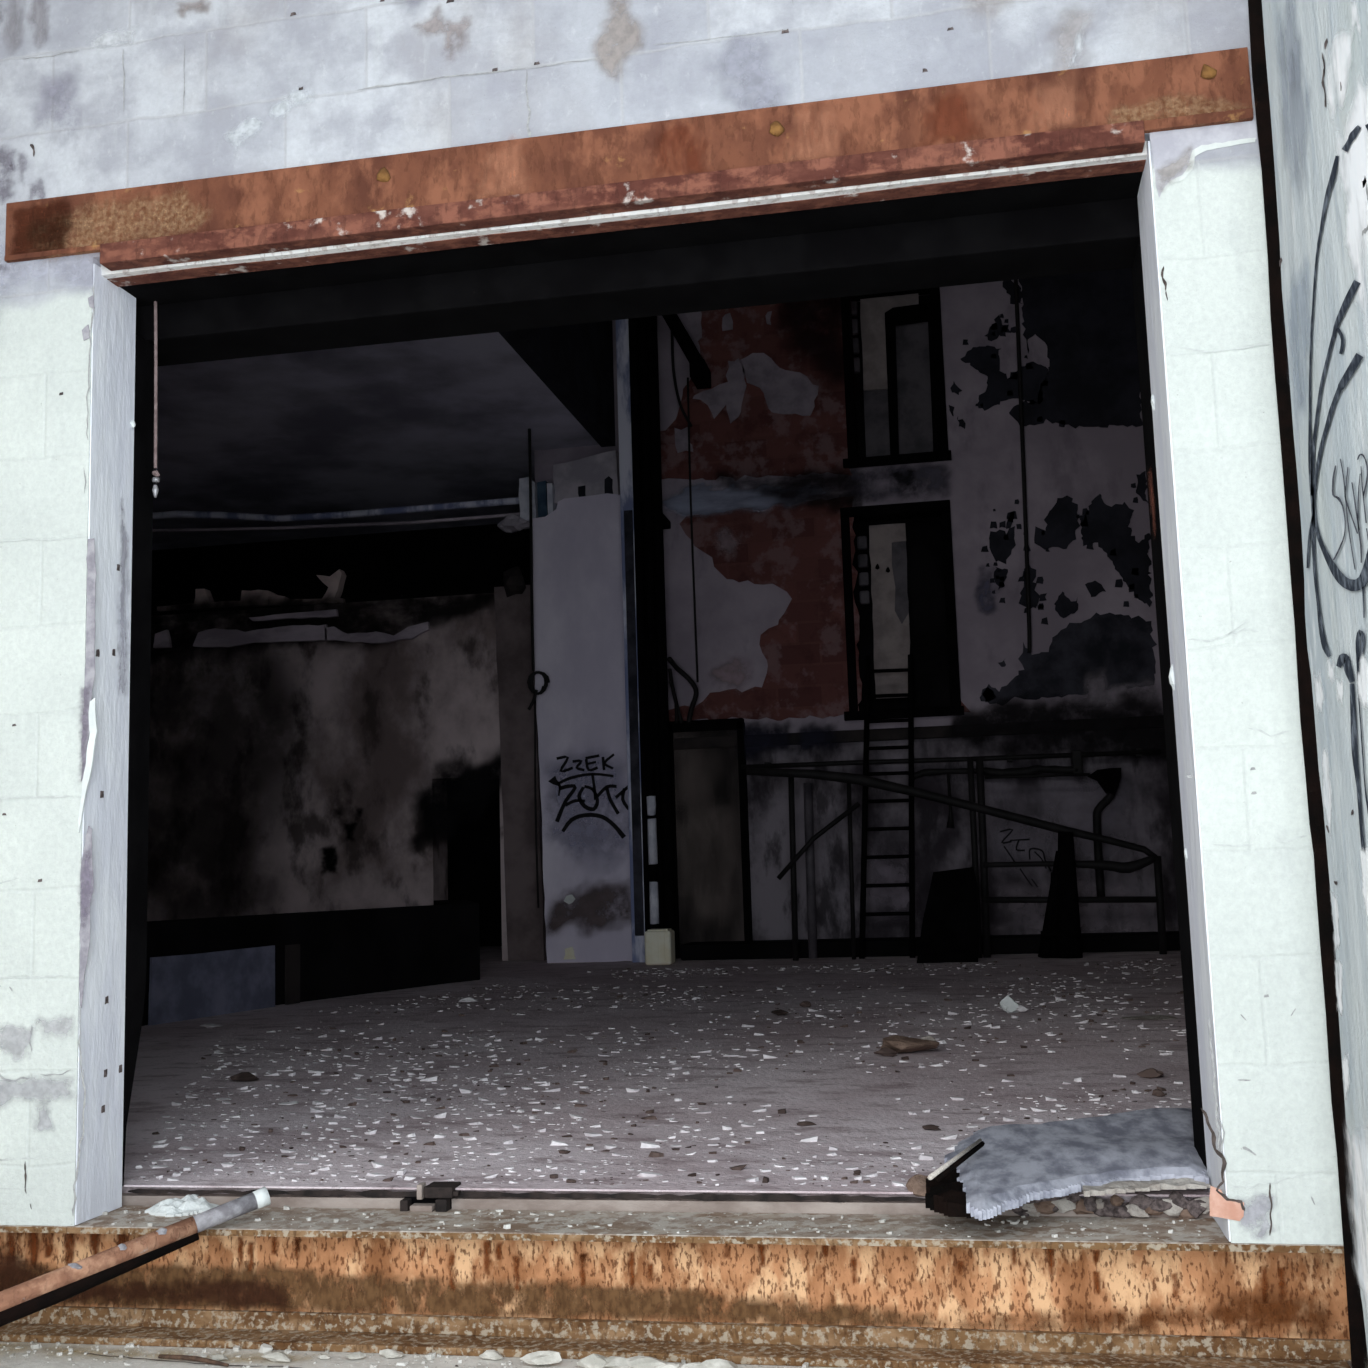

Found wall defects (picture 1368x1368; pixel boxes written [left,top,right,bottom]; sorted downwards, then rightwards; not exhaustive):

damp [597,0,639,72]
damp [0,151,24,200]
rust [13,198,201,255]
spalling [660,303,852,481]
peeling [961,268,1143,429]
spalling [669,501,862,721]
peeling [980,471,1157,708]
damp [0,1018,72,1059]
damp [0,1079,69,1130]
spalling [1201,1108,1272,1237]
crack [1209,1015,1334,1235]
rust [1070,1298,1328,1328]